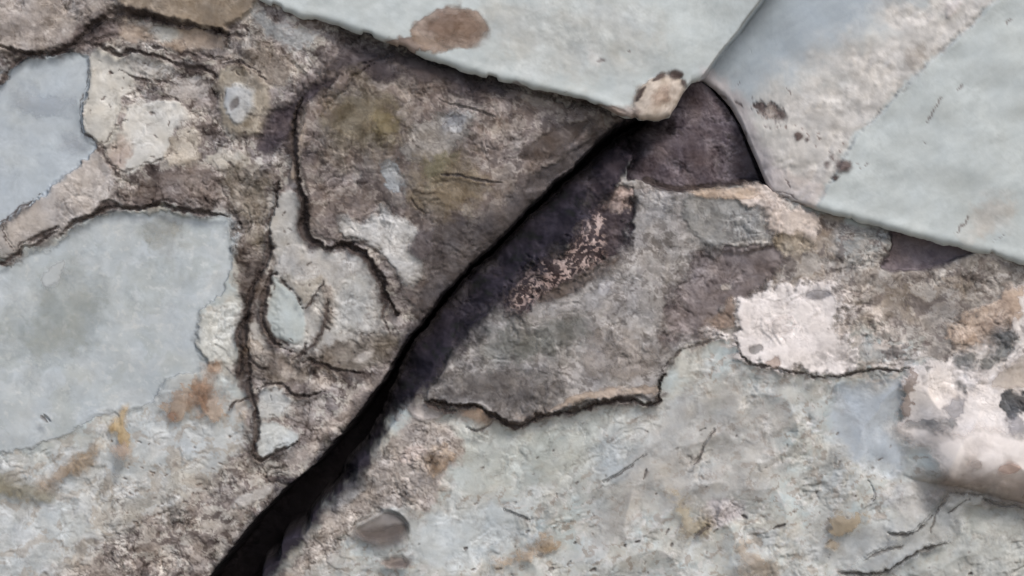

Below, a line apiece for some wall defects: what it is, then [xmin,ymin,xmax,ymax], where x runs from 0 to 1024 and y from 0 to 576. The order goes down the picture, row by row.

peeling [0,52,97,224]
peeling [0,210,237,453]
crack [210,97,645,576]
spalling [258,47,859,424]
spalling [881,231,972,271]
peeling [898,283,1024,439]